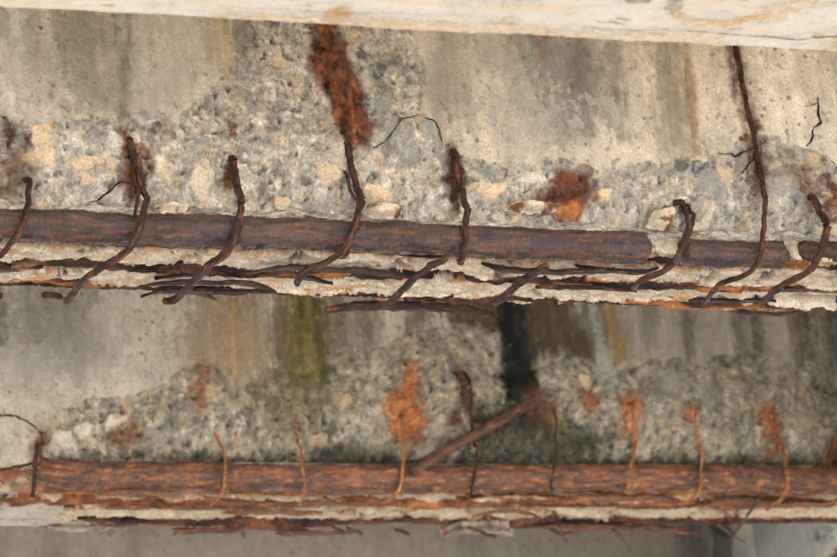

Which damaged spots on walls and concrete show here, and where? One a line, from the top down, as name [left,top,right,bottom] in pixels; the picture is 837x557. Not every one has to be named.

corrosion [225,8,471,145]
crack [373,114,443,149]
spalling [0,18,837,311]
crack [805,102,837,170]
corrosion [140,264,411,301]
corrosion [481,262,659,293]
water stain [184,294,375,388]
spalling [30,325,837,470]
water stain [436,300,698,465]
crack [0,414,44,471]
water stain [311,444,398,464]
spalling [0,478,837,543]